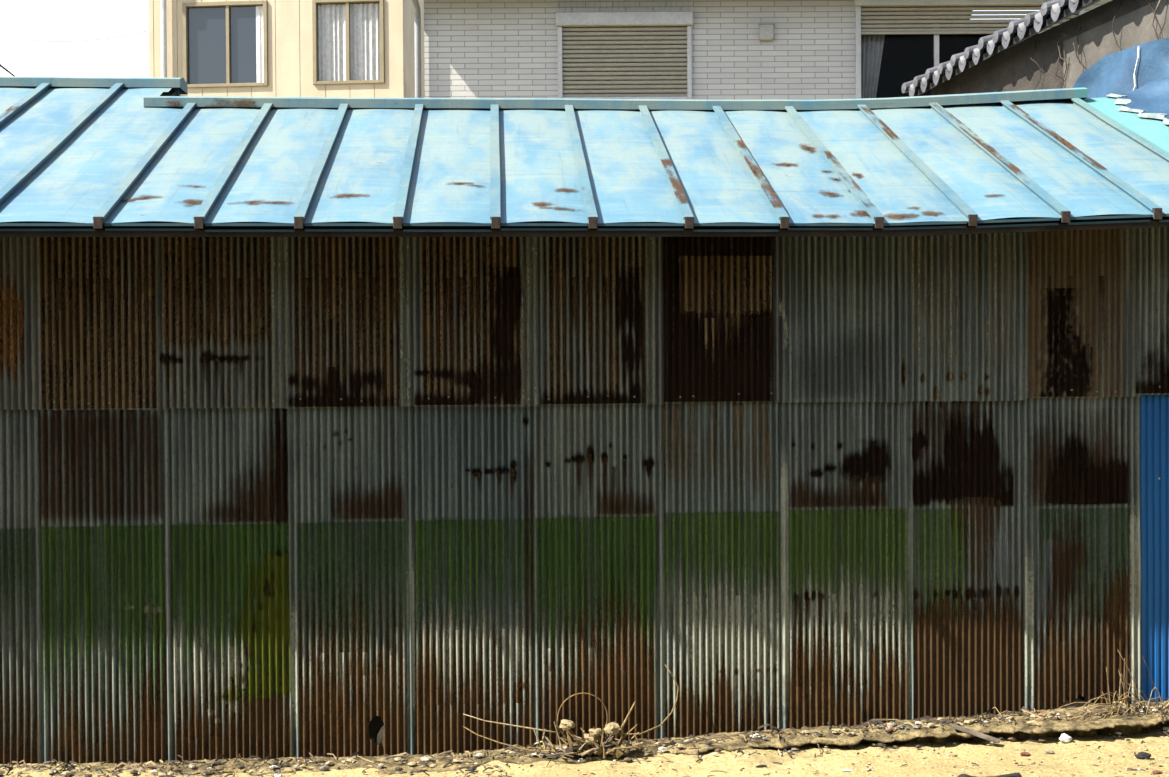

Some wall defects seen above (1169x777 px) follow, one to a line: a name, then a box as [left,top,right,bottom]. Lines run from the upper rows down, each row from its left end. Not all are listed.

rust [0,277,24,383]
rust [39,237,400,523]
rust [414,237,646,426]
rust [643,237,774,485]
rust [1027,228,1122,397]
rust [1136,328,1169,394]
rust [0,372,1131,765]